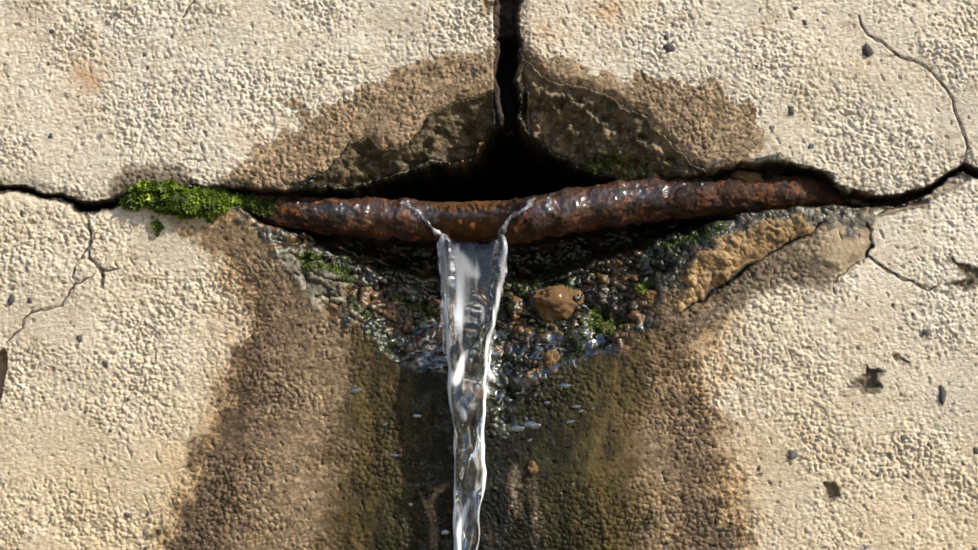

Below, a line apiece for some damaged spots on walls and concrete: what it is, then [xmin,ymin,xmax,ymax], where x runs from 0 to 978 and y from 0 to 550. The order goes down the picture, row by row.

water stain [215,43,497,191]
crack [493,0,528,133]
water stain [520,45,772,172]
crack [846,16,978,210]
crack [0,184,129,343]
spalling [187,52,969,439]
crack [833,244,938,294]
spalling [945,256,978,290]
spalling [0,349,8,399]
water stain [157,210,371,550]
water stain [620,268,754,550]
spalling [824,481,842,501]